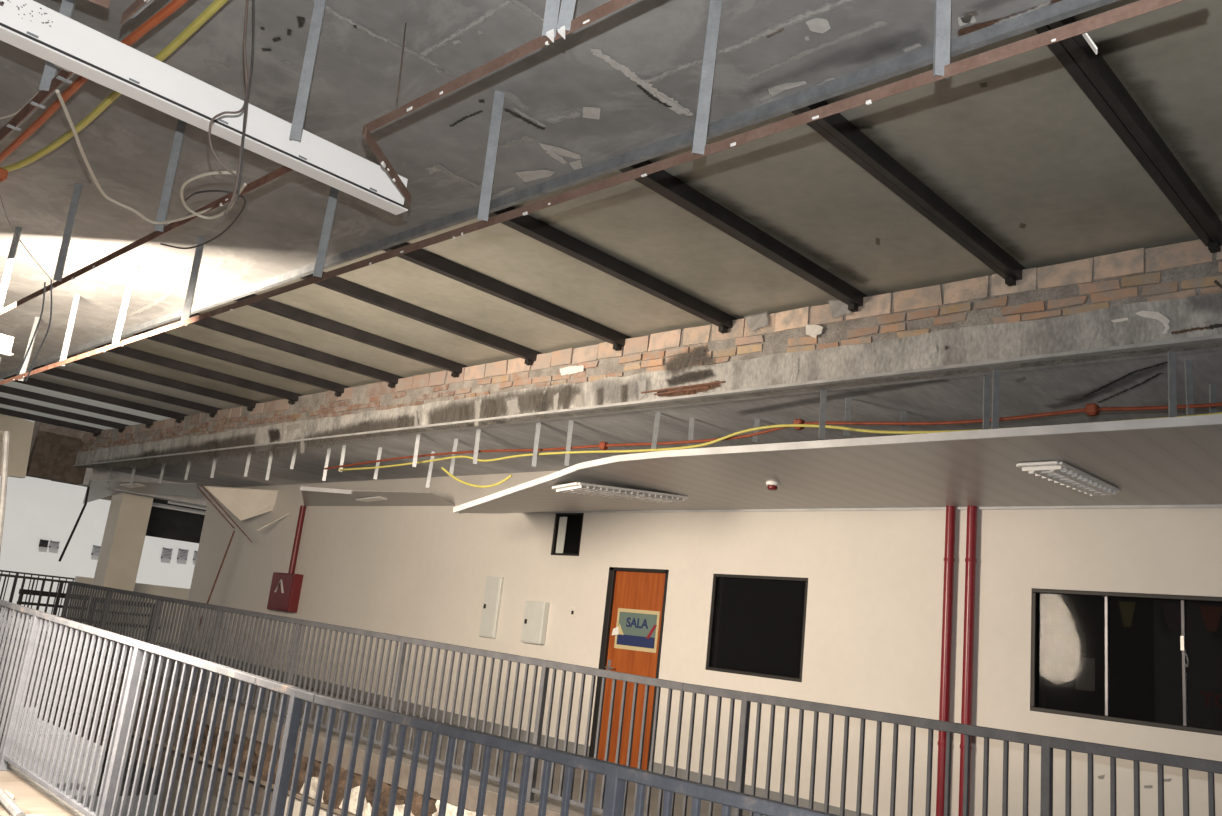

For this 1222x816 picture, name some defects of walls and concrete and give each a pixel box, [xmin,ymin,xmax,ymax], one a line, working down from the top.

peeling [805,18,831,41]
crack [590,49,723,116]
peeling [493,137,583,196]
damp [664,346,713,373]